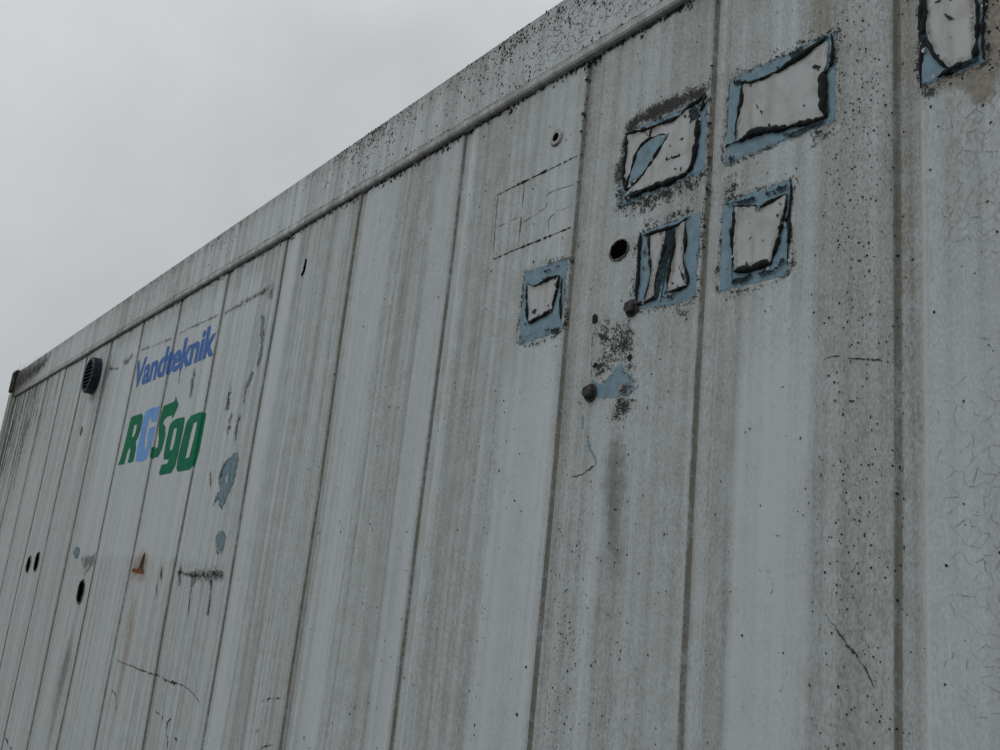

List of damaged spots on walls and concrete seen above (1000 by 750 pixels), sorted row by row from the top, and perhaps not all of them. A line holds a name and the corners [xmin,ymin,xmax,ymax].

crack [521,0,648,77]
peeling [913,0,991,89]
damp [915,0,1000,108]
peeling [620,27,842,207]
peeling [515,256,574,347]
peeling [633,210,706,315]
peeling [714,175,798,294]
peeling [243,315,264,404]
peeling [581,330,634,402]
peeling [209,388,241,509]
damp [797,440,905,681]
crack [118,660,200,706]